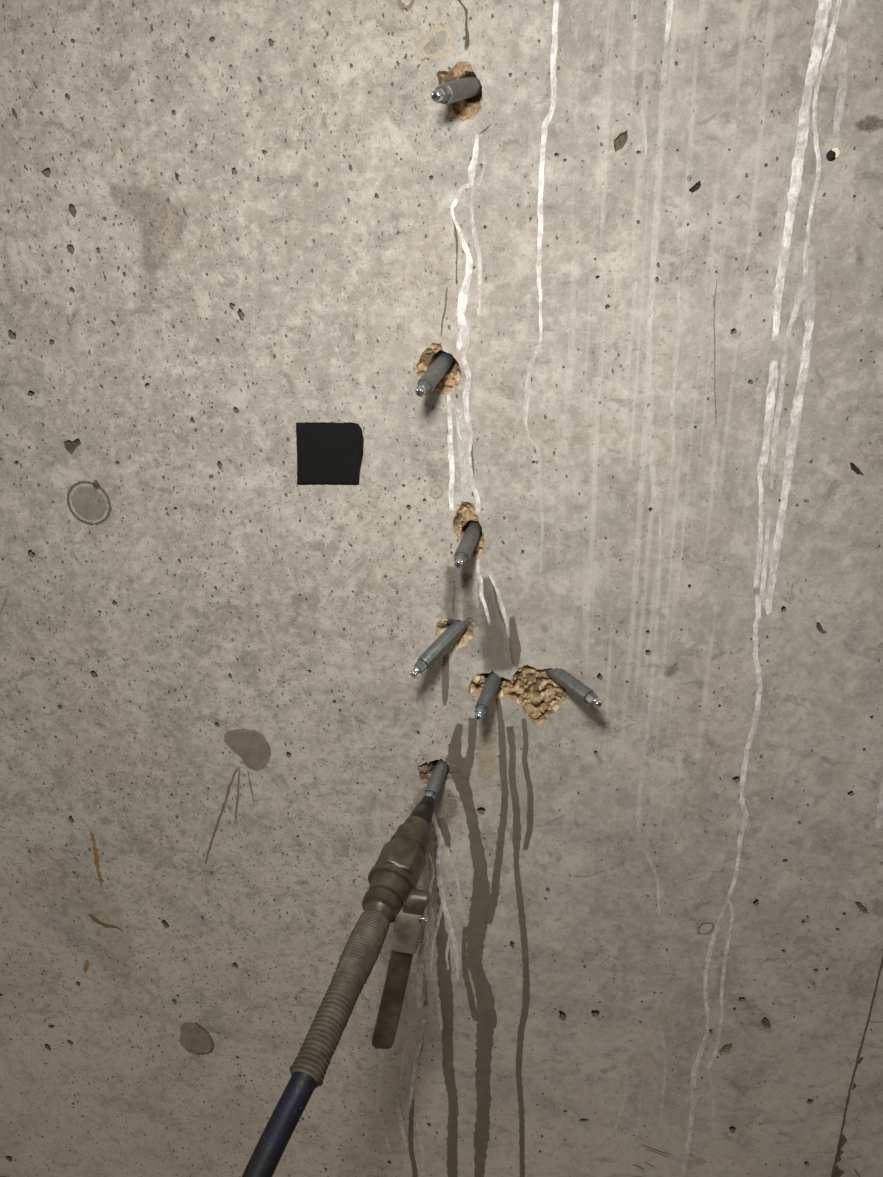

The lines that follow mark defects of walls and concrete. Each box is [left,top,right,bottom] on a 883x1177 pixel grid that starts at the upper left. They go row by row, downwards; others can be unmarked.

crack [458,0,469,49]
crack [441,222,458,334]
efflorescence [536,0,560,340]
crack [468,446,476,485]
crack [488,577,514,663]
efflorescence [683,0,842,1171]
leakage [381,699,533,1177]
crack [831,956,883,1177]